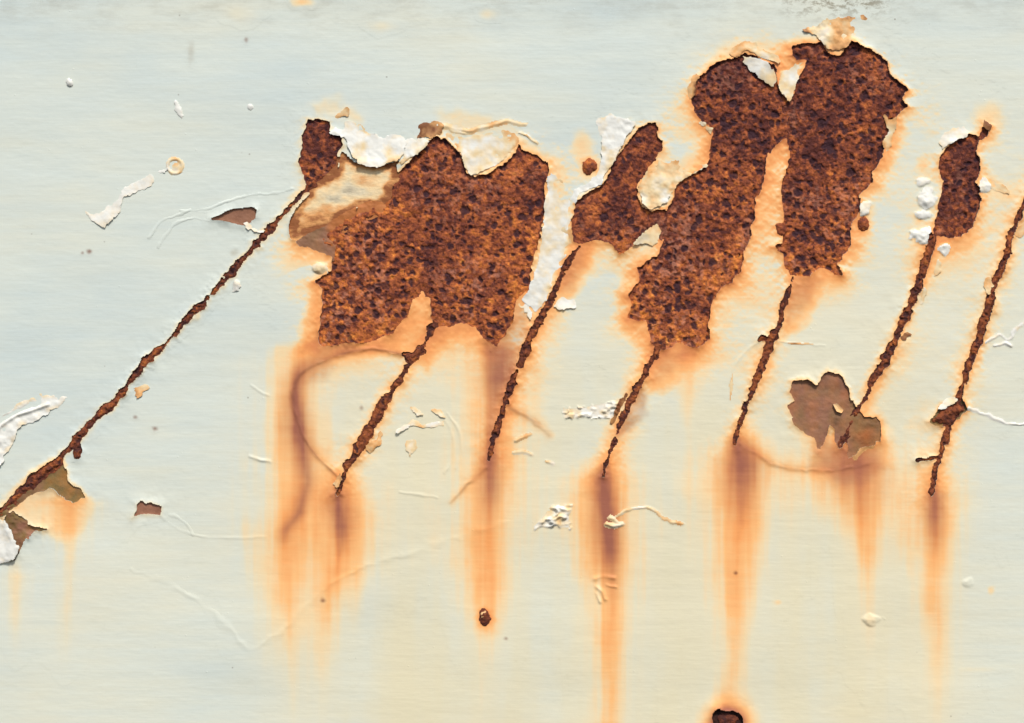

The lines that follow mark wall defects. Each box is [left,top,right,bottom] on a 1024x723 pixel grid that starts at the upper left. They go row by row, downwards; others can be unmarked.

peeling [211,207,264,233]
corrosion [561,0,1024,447]
peeling [0,393,67,465]
corrosion [199,87,1024,723]
spalling [777,361,881,469]